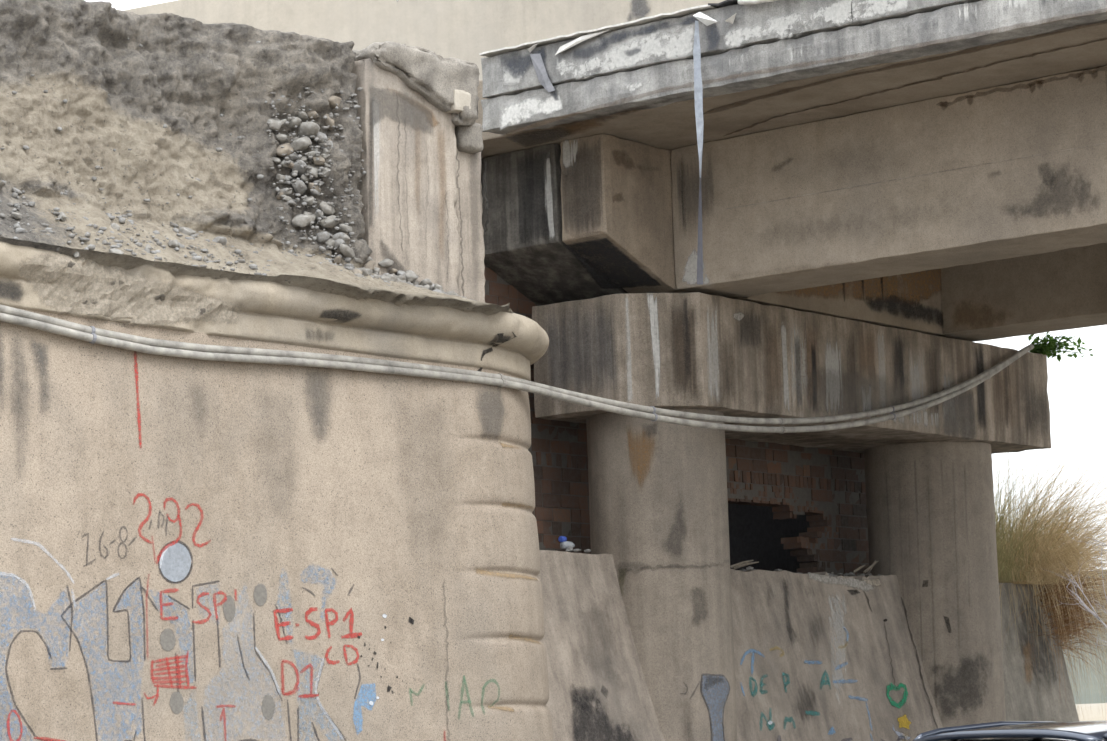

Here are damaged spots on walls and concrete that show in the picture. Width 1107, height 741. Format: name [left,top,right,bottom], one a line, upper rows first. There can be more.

water stain [501,49,647,167]
corrosion [703,20,1107,136]
water stain [518,154,554,242]
water stain [0,281,23,300]
spalling [21,255,240,326]
water stain [683,251,708,284]
water stain [33,344,47,395]
water stain [573,691,634,741]